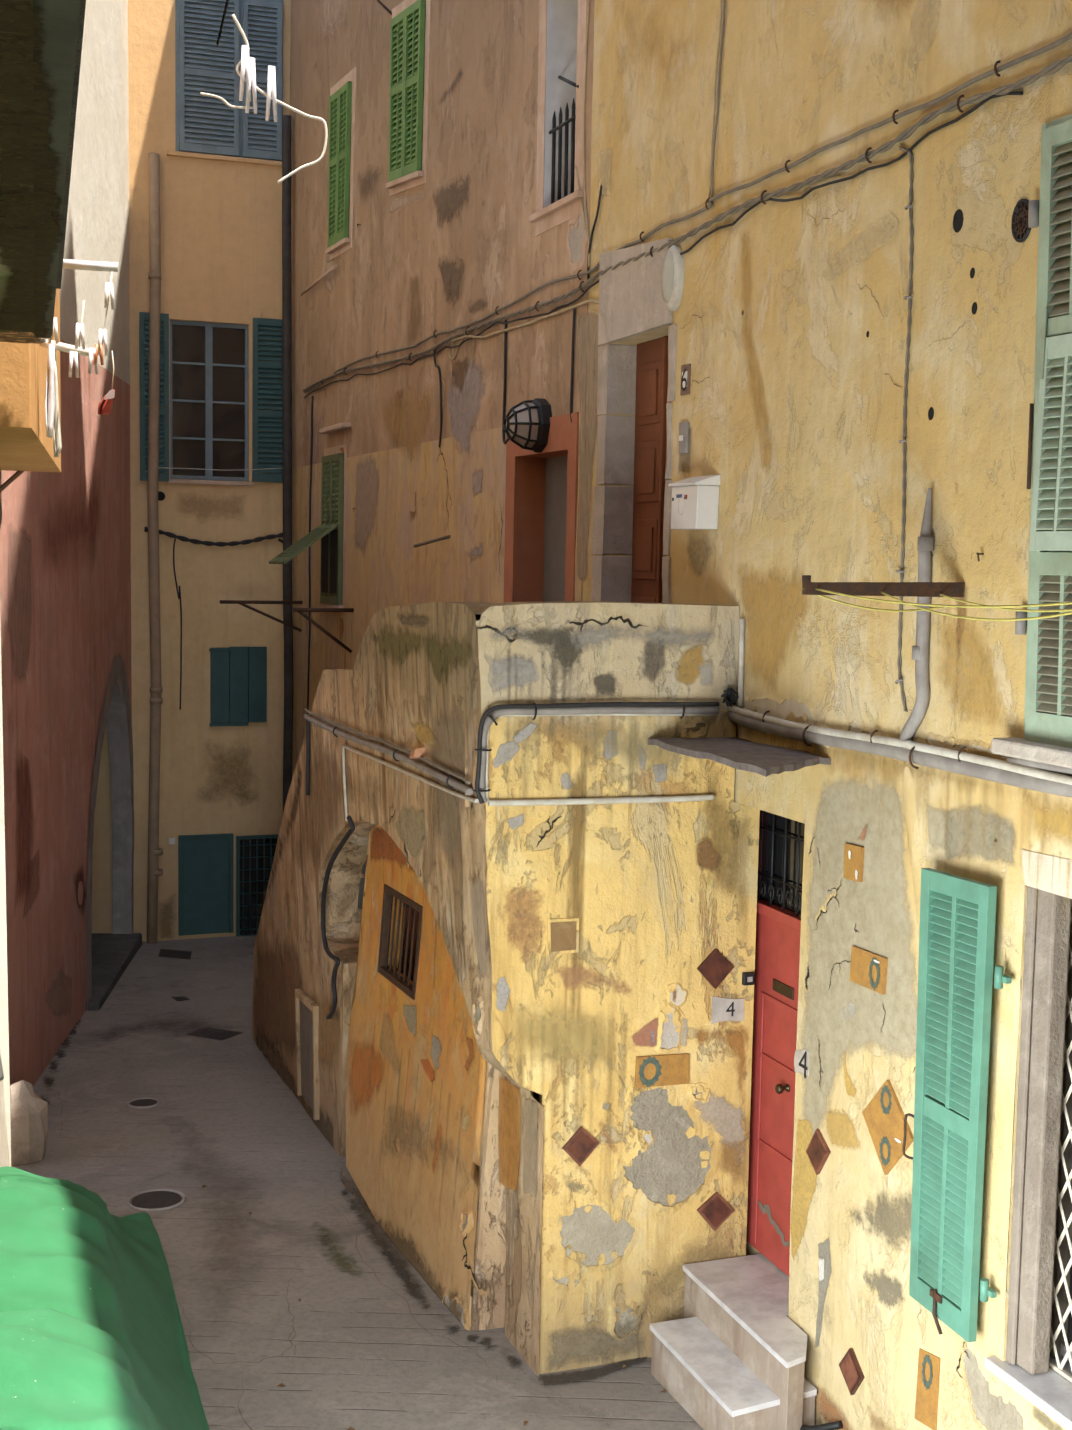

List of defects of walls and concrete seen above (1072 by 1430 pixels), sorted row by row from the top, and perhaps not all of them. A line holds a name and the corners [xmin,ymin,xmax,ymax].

leakage [0,0,63,344]
crack [568,610,649,632]
peeling [928,806,1015,863]
peeling [790,781,917,1259]
flaking render [546,1082,744,1296]
peeling [814,1237,831,1348]